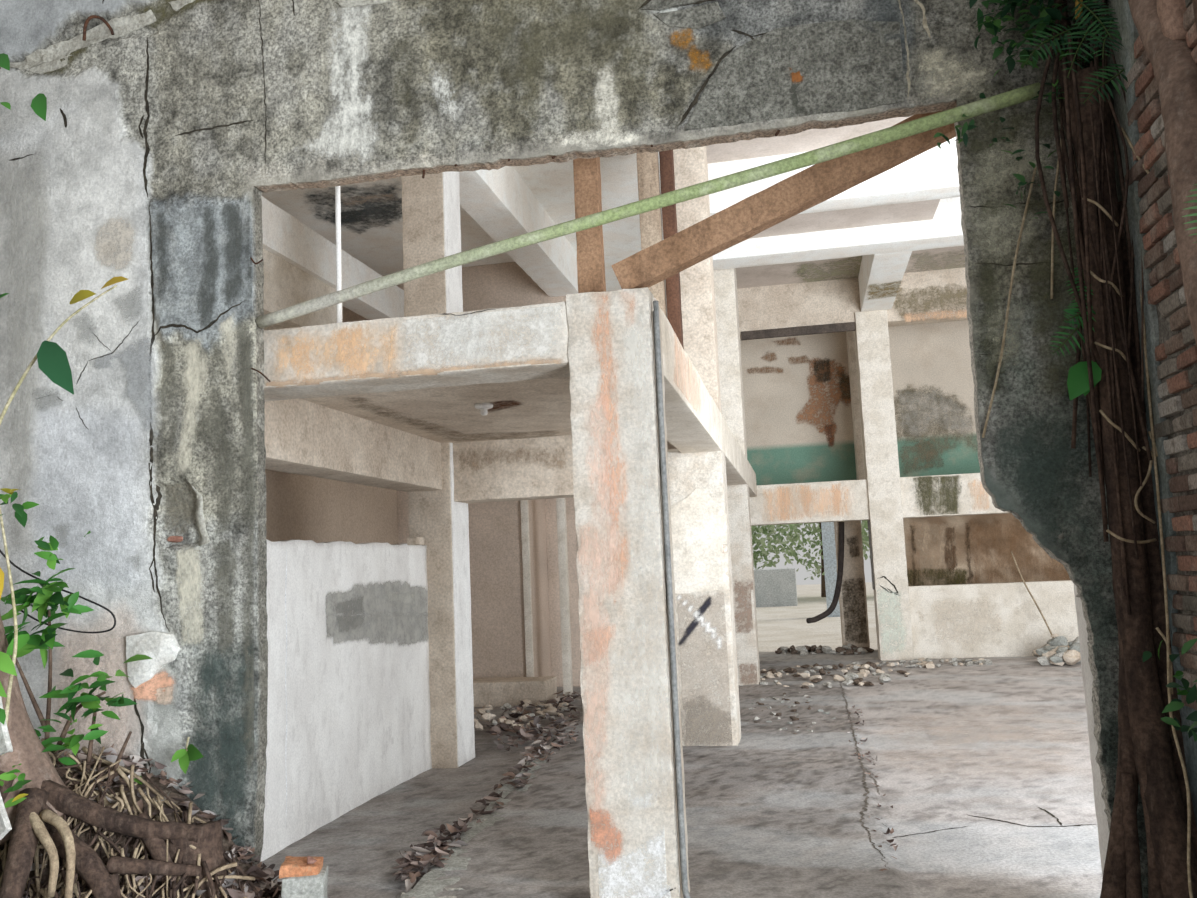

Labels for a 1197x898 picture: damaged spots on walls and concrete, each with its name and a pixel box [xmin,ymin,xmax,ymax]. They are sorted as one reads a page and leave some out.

spalling [10,9,157,74]
spalling [168,0,195,12]
leakage [306,7,376,157]
crack [677,30,766,127]
leakage [307,185,402,231]
crack [38,0,267,632]
spalling [748,338,851,446]
leakage [94,204,255,846]
leakage [894,387,977,586]
peeling [126,631,180,704]
rust [590,775,622,859]
crack [839,683,1095,870]